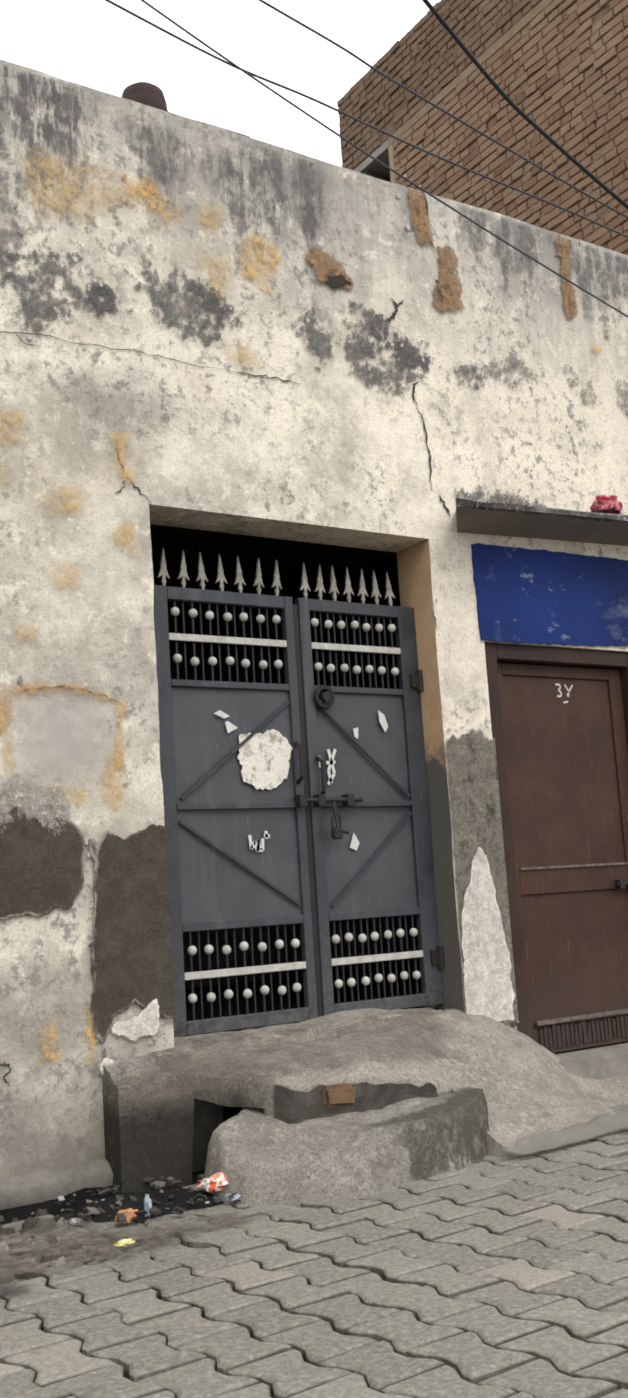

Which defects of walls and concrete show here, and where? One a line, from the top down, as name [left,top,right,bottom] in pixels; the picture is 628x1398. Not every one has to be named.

crack [0,331,298,384]
water stain [0,65,323,364]
flaking render [295,246,354,301]
water stain [291,301,433,396]
crack [385,298,405,321]
flaking render [397,175,465,312]
water stain [454,350,533,389]
flaking render [555,234,582,319]
crack [412,380,451,517]
flaking render [446,719,519,1027]
flaking render [0,774,175,1076]